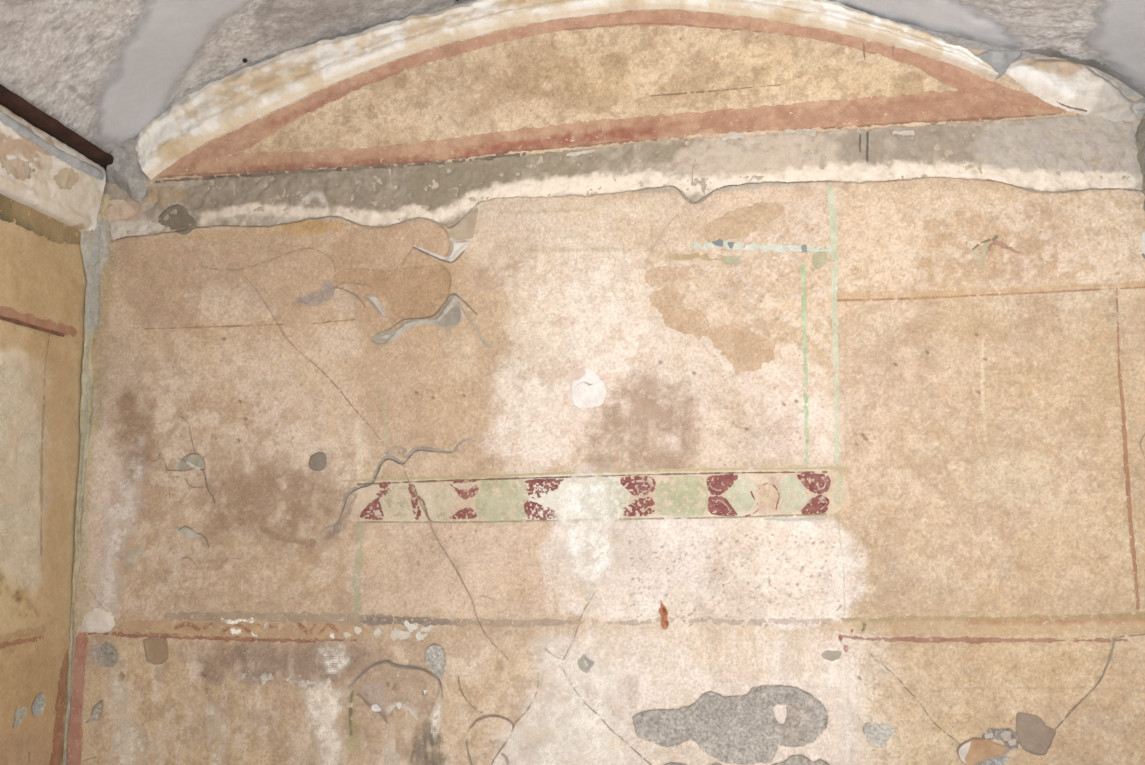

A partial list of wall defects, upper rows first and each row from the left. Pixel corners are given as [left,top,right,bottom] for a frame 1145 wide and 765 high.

flaking render [110,114,1143,348]
crack [244,276,511,663]
crack [458,676,483,713]
crack [491,590,652,765]
flaking render [632,685,829,765]
crack [870,653,960,745]